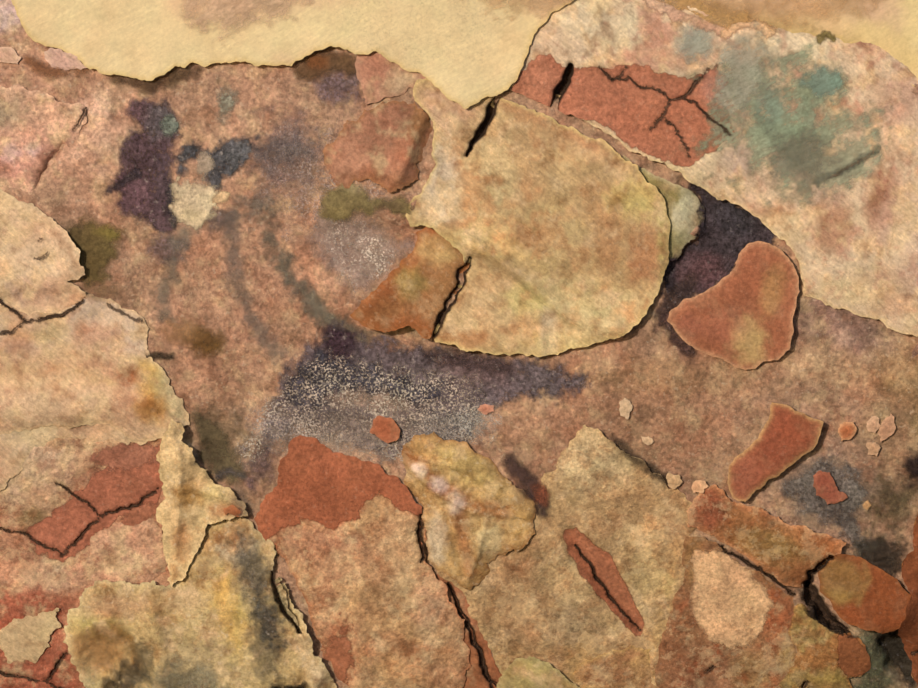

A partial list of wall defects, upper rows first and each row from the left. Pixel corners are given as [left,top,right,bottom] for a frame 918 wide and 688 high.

spalling [0,47,21,64]
crack [466,97,501,157]
crack [551,63,574,106]
crack [599,66,731,157]
flaking render [11,0,918,370]
crack [432,257,472,338]
flaking render [0,84,190,688]
crack [0,482,159,558]
crack [416,514,425,563]
crack [574,544,642,631]
crack [720,545,850,633]
crack [447,582,497,688]